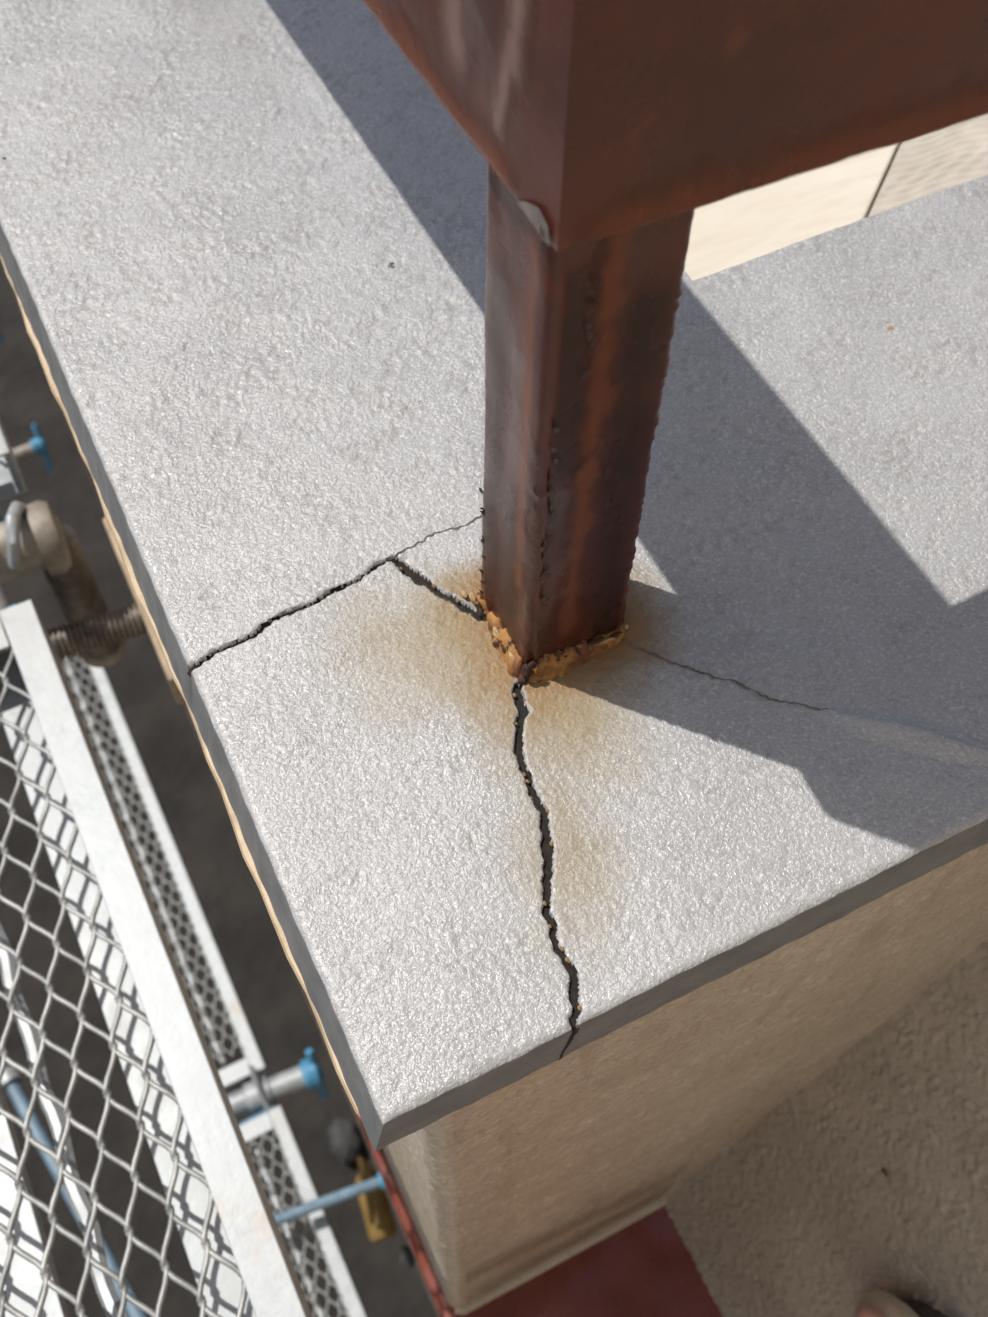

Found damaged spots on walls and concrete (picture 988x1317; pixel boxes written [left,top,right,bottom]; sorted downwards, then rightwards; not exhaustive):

crack [187,510,483,677]
rust [442,566,662,725]
crack [621,639,829,711]
crack [512,687,582,1060]